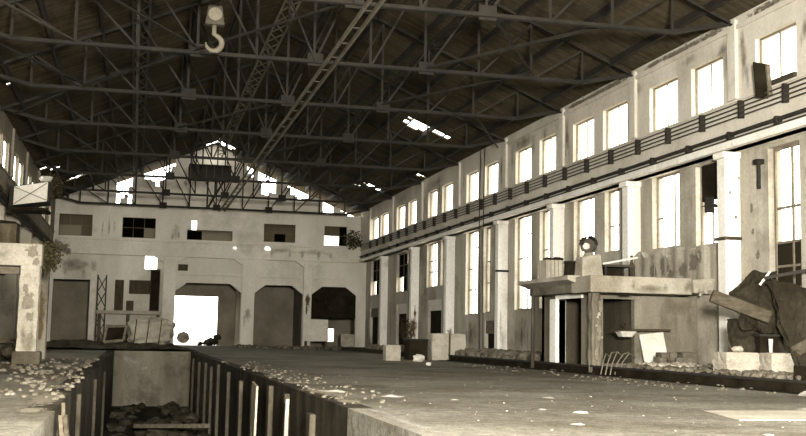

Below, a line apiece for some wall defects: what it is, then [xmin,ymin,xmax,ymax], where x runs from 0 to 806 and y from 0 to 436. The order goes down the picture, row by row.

spalling [23,243,42,265]
peeling [650,250,701,278]
spalling [20,284,37,321]